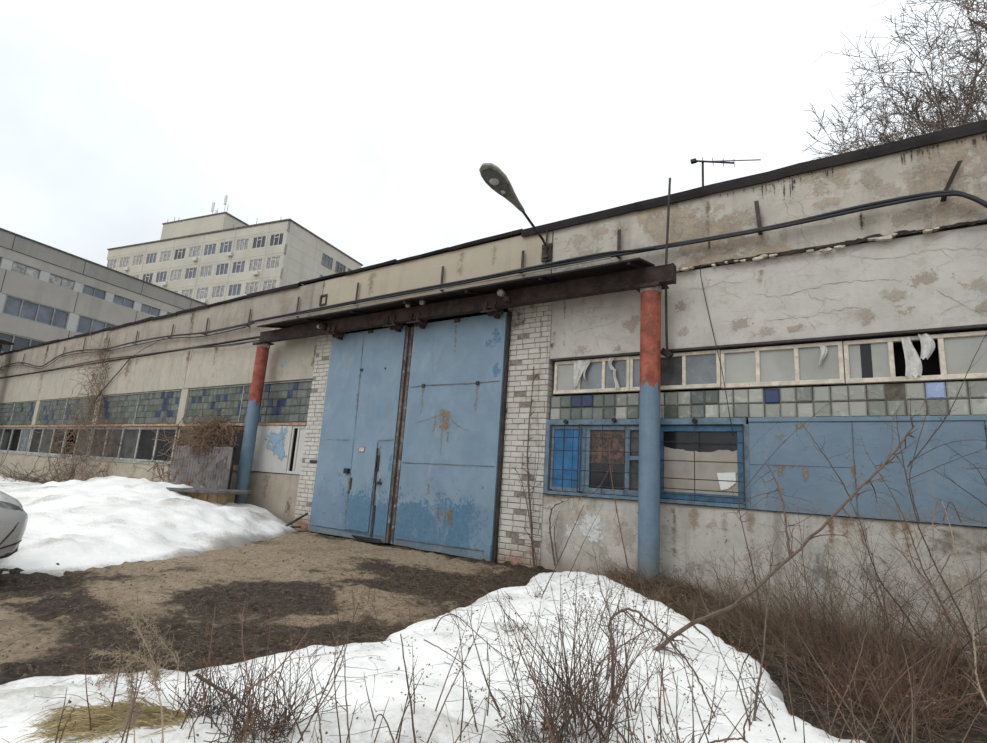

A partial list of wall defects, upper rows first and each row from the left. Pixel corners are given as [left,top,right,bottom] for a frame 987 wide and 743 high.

peeling [676,204,987,272]
crack [685,248,987,328]
peeling [963,277,987,315]
peeling [265,425,288,460]